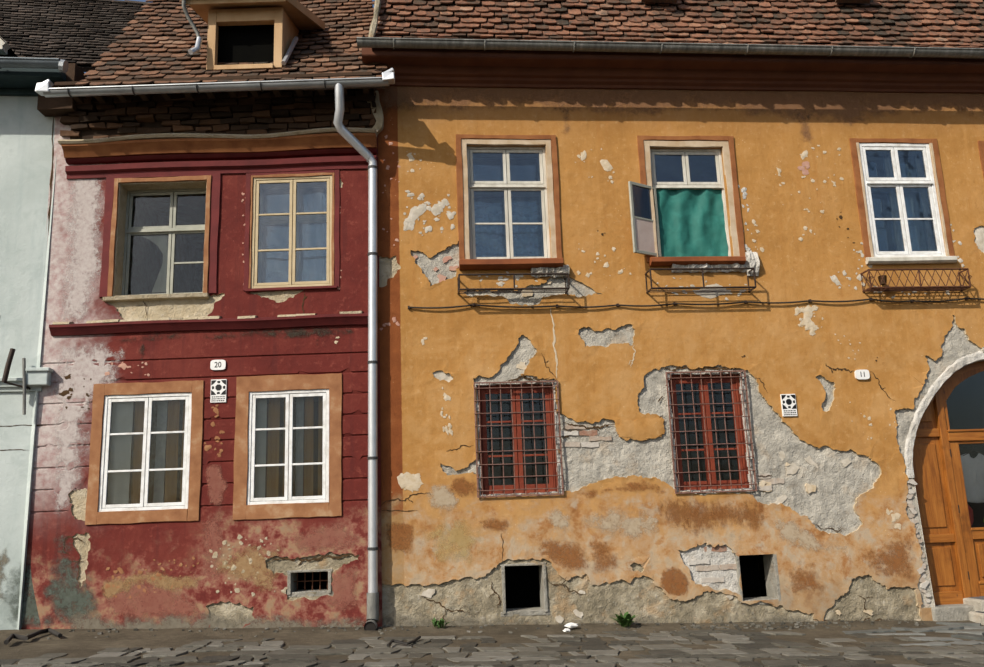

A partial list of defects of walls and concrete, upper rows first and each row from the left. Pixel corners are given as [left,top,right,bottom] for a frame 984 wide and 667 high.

flaking render [58,88,459,287]
flaking render [473,335,555,386]
crack [508,308,558,381]
crack [826,365,895,401]
flaking render [558,355,880,536]
damp [206,466,226,503]
damp [431,478,474,507]
damp [103,573,197,619]
flaking render [105,535,359,626]
damp [387,523,413,551]
damp [542,542,584,569]
flaking render [382,478,935,627]